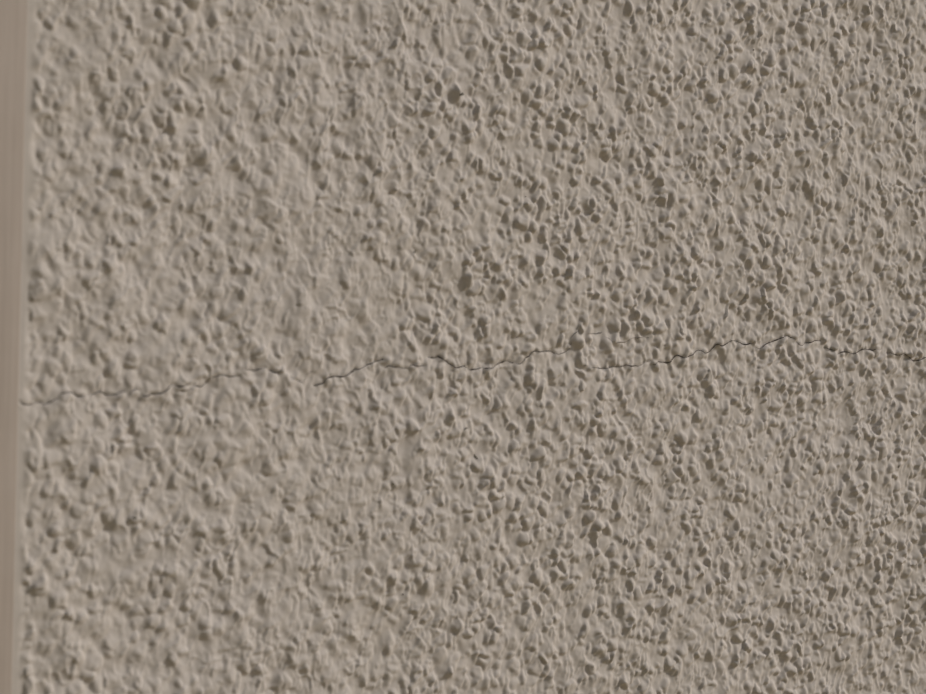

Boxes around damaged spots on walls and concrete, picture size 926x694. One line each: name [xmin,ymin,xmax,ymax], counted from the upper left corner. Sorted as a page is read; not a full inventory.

crack [20,331,642,405]
crack [584,336,926,369]